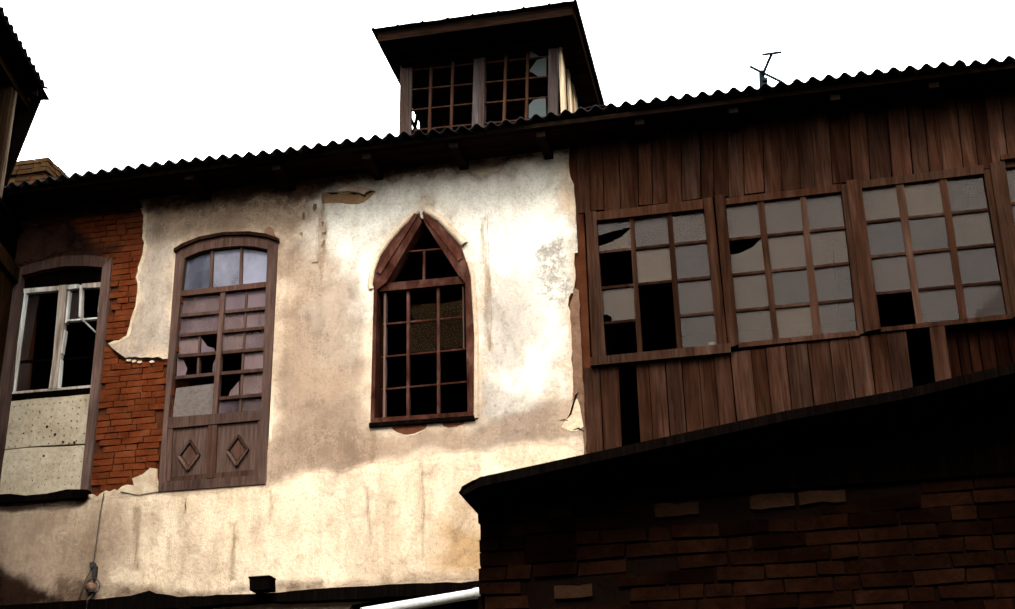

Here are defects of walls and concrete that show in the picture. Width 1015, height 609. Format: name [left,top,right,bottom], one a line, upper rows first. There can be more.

spalling [302,186,375,220]
spalling [45,208,179,501]
damp [140,153,580,476]
damp [0,508,138,601]
damp [109,587,164,597]